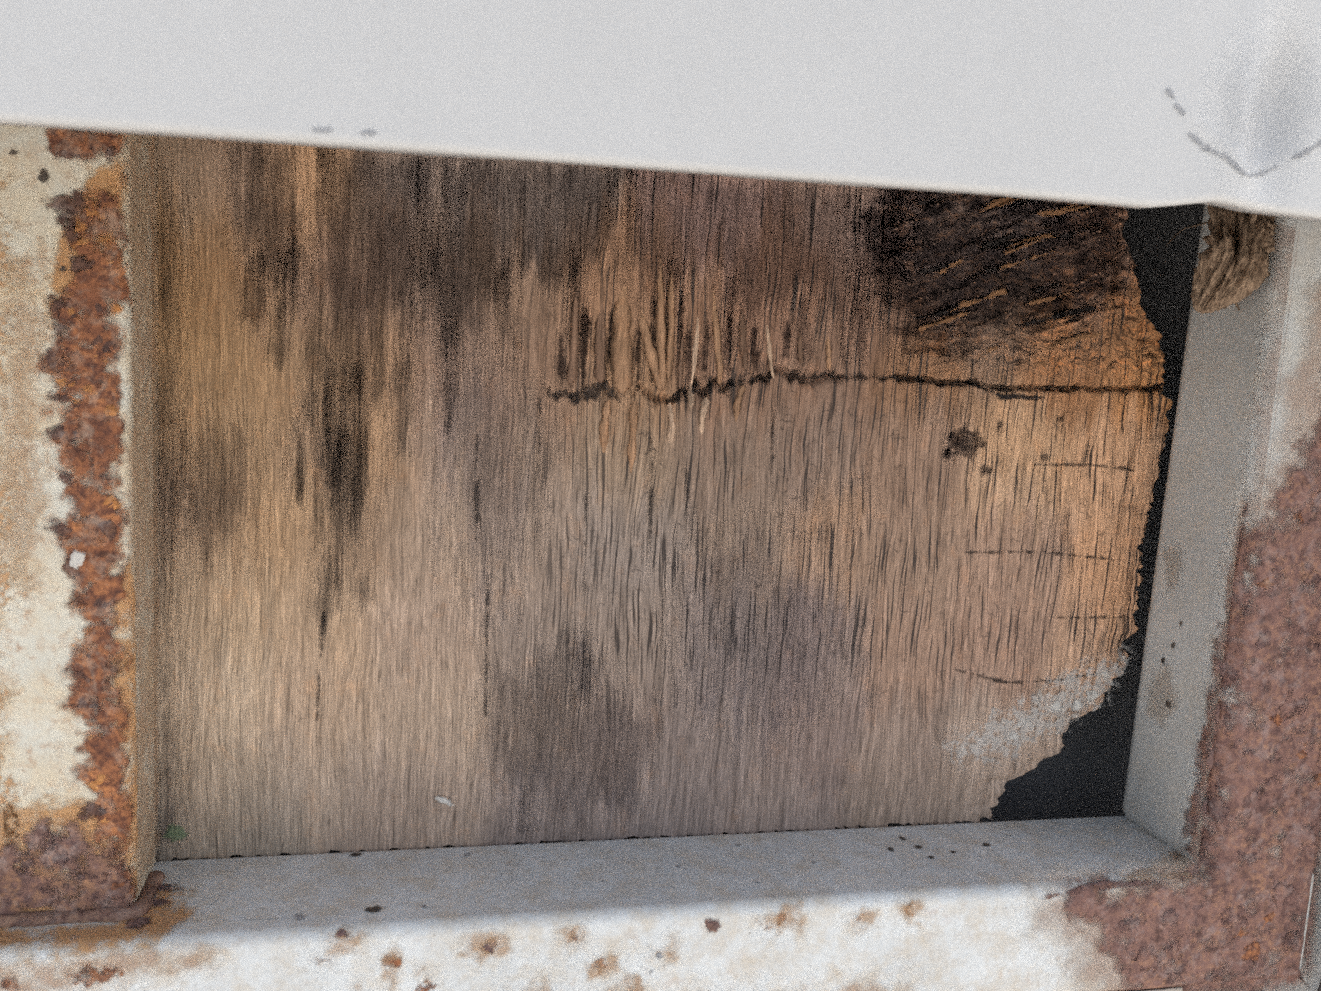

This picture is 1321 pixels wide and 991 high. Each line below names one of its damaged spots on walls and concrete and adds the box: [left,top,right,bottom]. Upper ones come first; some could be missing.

peeling [1038,203,1091,216]
peeling [1001,234,1054,269]
damp [1022,302,1105,343]
crack [539,381,622,416]
crack [666,371,1162,403]
corrosion [0,128,194,991]
corrosion [1044,290,1321,991]